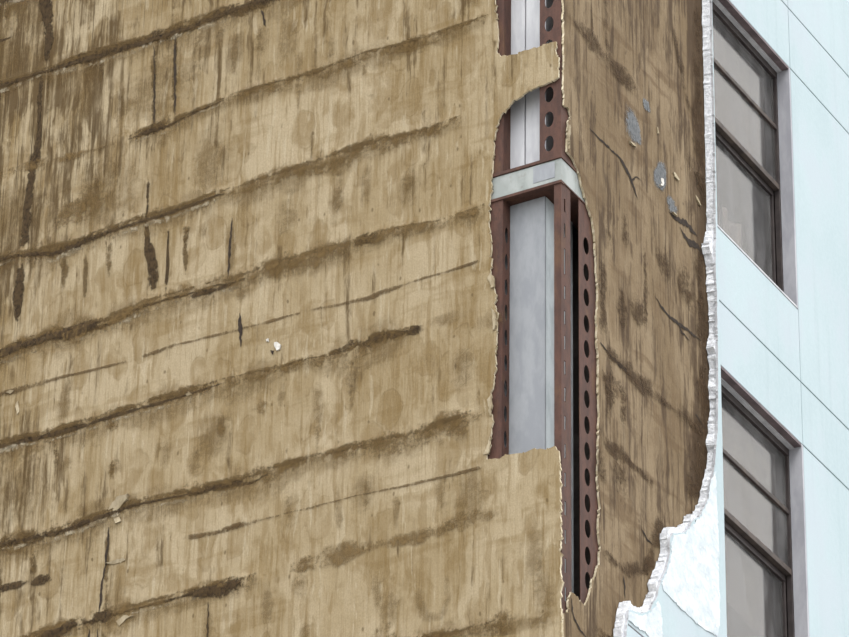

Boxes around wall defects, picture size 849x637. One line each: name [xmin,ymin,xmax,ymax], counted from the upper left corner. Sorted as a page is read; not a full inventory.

peeling [626,110,641,147]
leakage [0,0,483,361]
crack [590,129,639,198]
peeling [654,162,680,216]
crack [669,212,704,260]
crack [656,298,701,341]
leakage [0,325,421,463]
leakage [598,347,709,497]
leakage [0,410,468,553]
peeling [661,471,720,637]
leakage [23,575,250,637]
peeling [628,601,663,637]